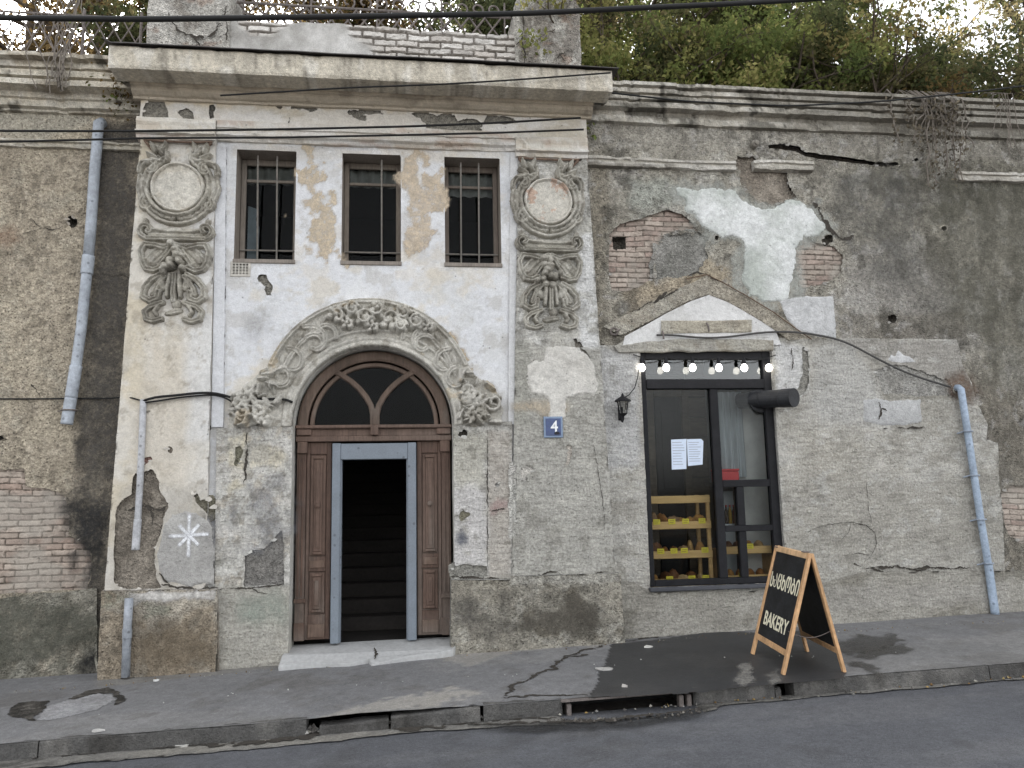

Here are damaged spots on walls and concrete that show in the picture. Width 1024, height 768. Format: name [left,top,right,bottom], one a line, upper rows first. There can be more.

peeling [294,145,349,268]
peeling [394,150,449,254]
flaking render [609,210,719,291]
spalling [736,155,796,207]
flaking render [795,235,843,288]
damp [61,122,140,674]
flaking render [0,468,92,595]
spalling [113,457,168,590]
spalling [243,531,284,587]
crack [809,483,970,572]
crack [387,635,700,731]
crack [145,732,320,749]